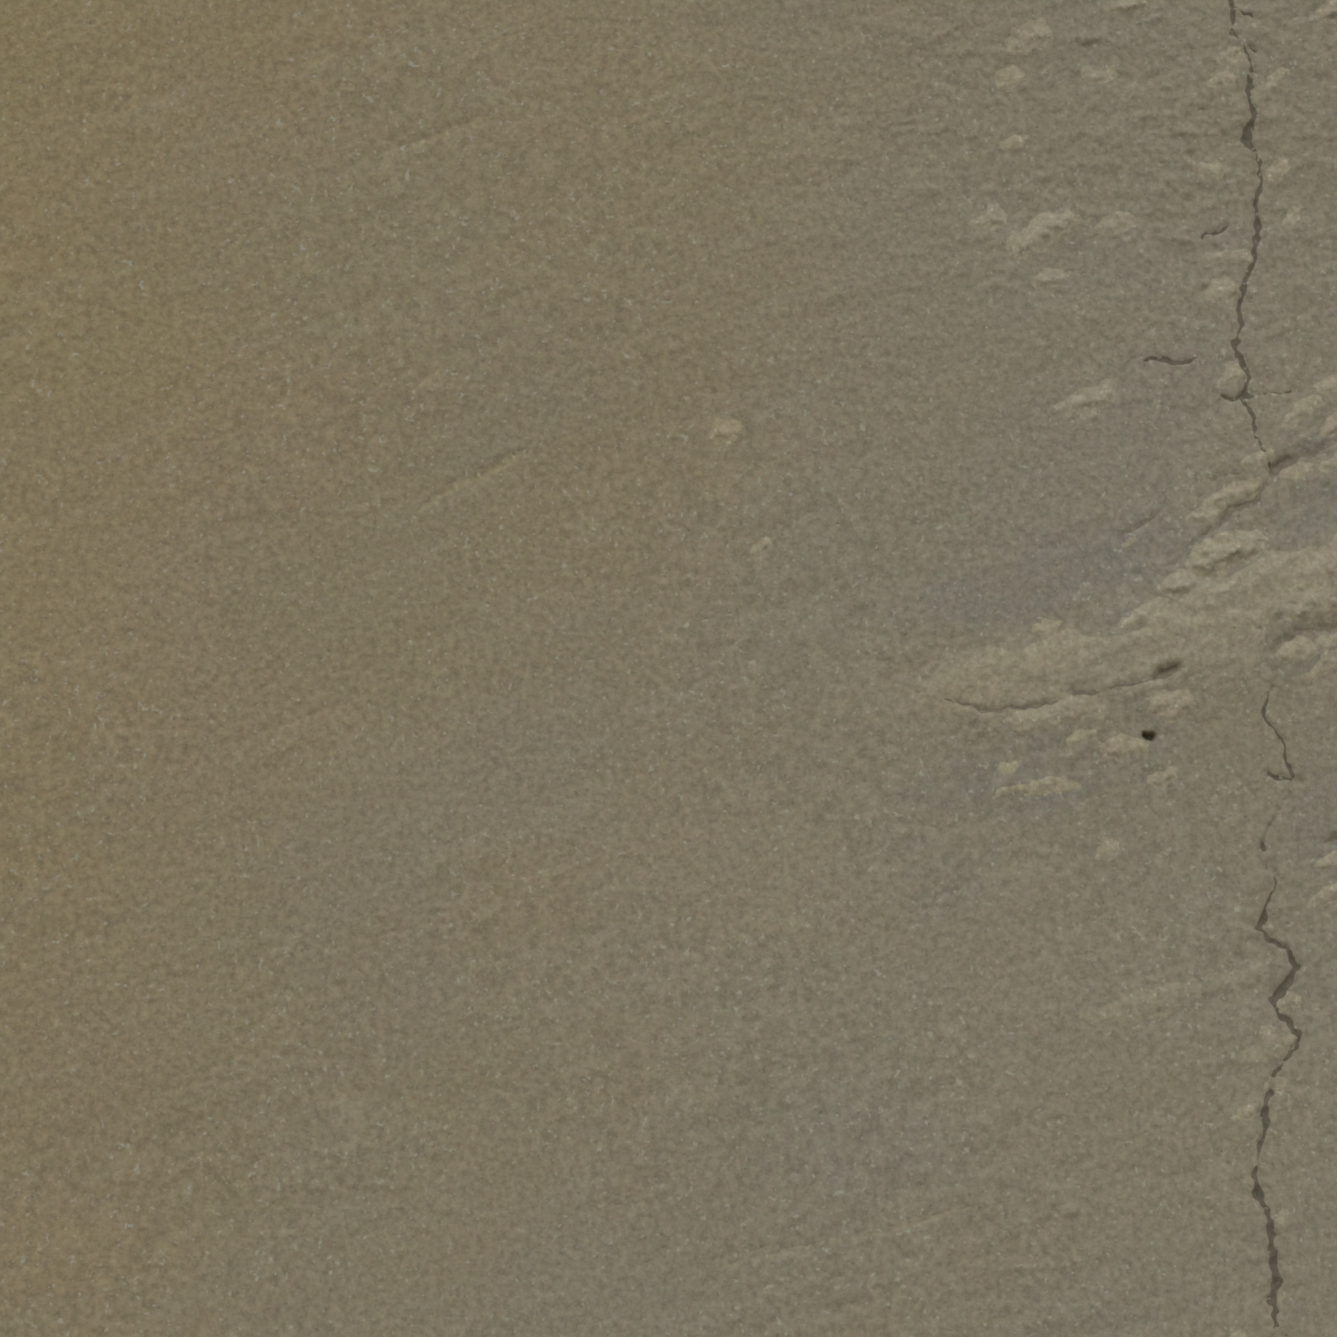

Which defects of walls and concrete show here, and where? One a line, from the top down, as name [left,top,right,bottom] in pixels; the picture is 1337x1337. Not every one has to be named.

crack [1144,0,1337,535]
crack [1261,694,1295,781]
crack [1230,819,1302,1337]